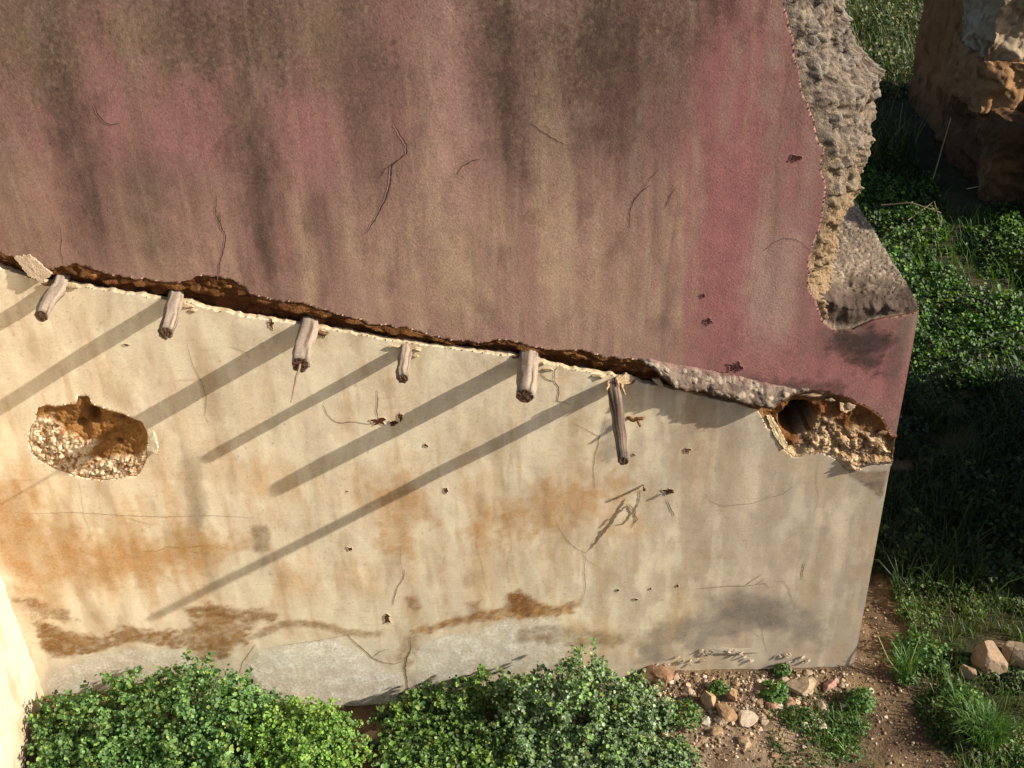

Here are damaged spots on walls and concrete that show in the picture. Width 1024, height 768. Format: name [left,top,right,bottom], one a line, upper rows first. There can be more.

crack [364,124,407,235]
flaking render [14,254,53,282]
flaking render [616,372,636,384]
spalling [29,396,158,480]
spalling [750,390,897,473]
crack [557,524,597,593]